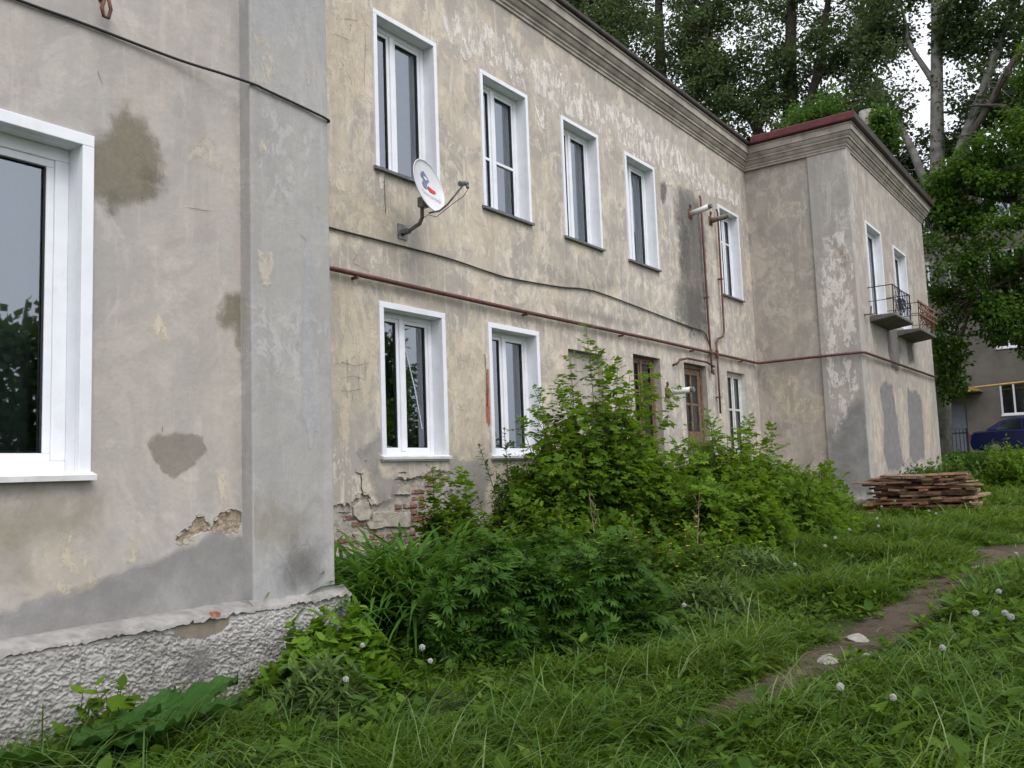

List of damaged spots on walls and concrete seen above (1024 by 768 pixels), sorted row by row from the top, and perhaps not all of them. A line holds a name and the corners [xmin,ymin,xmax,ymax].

leakage [94,112,158,213]
leakage [676,196,705,331]
peeling [769,231,859,433]
flaking render [175,477,241,545]
flaking render [333,471,455,550]